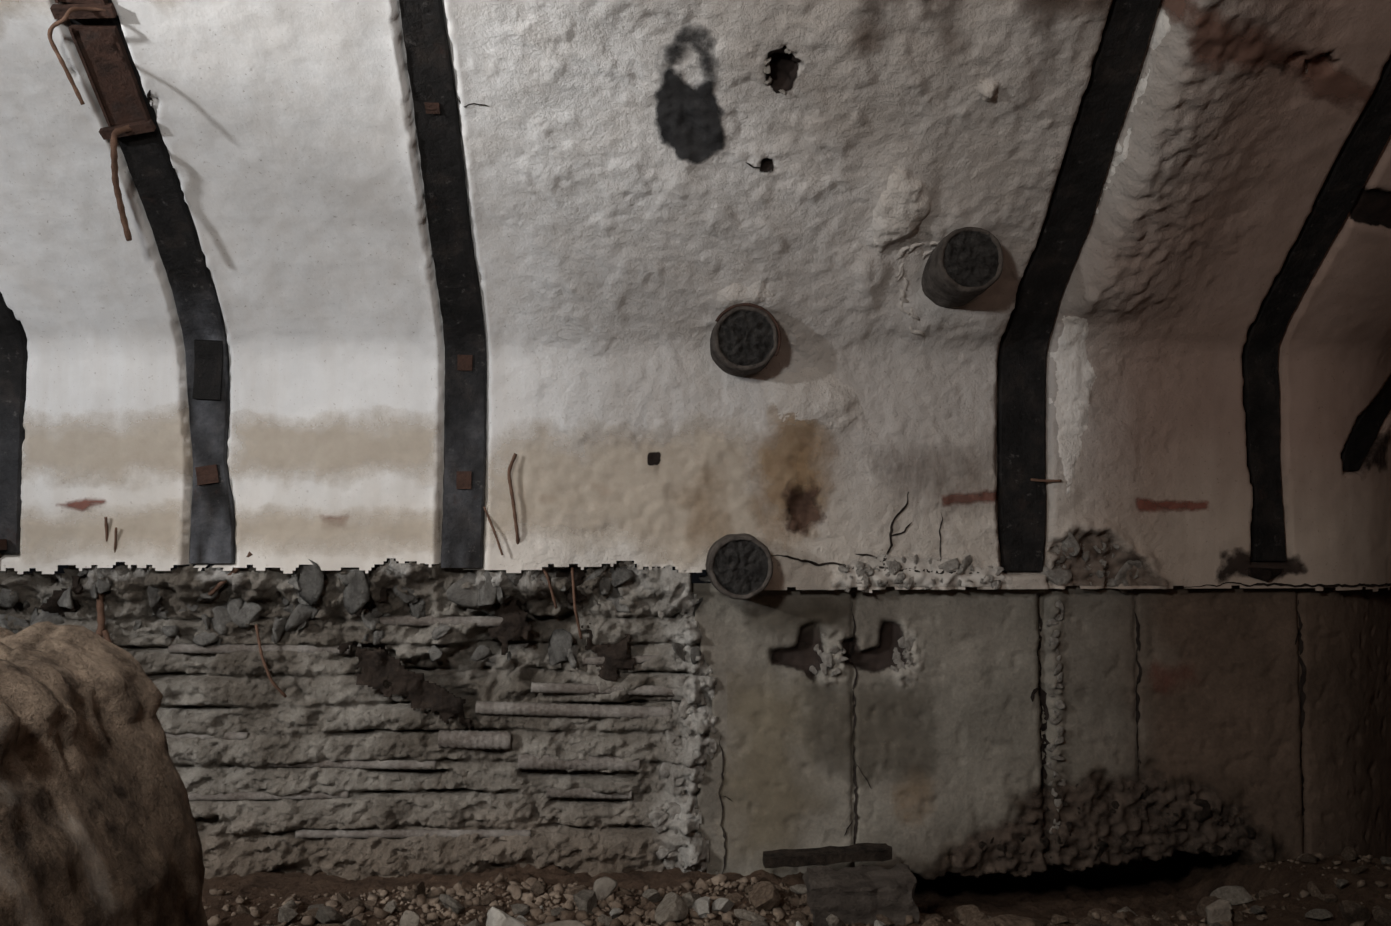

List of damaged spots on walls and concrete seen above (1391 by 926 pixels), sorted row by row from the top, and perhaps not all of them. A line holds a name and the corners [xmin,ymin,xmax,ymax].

damp [663,27,715,98]
spalling [763,45,801,95]
crack [771,492,979,574]
spalling [1040,531,1168,595]
spalling [771,621,917,681]
spalling [0,558,718,881]
crack [844,602,871,844]
spalling [922,770,1280,880]